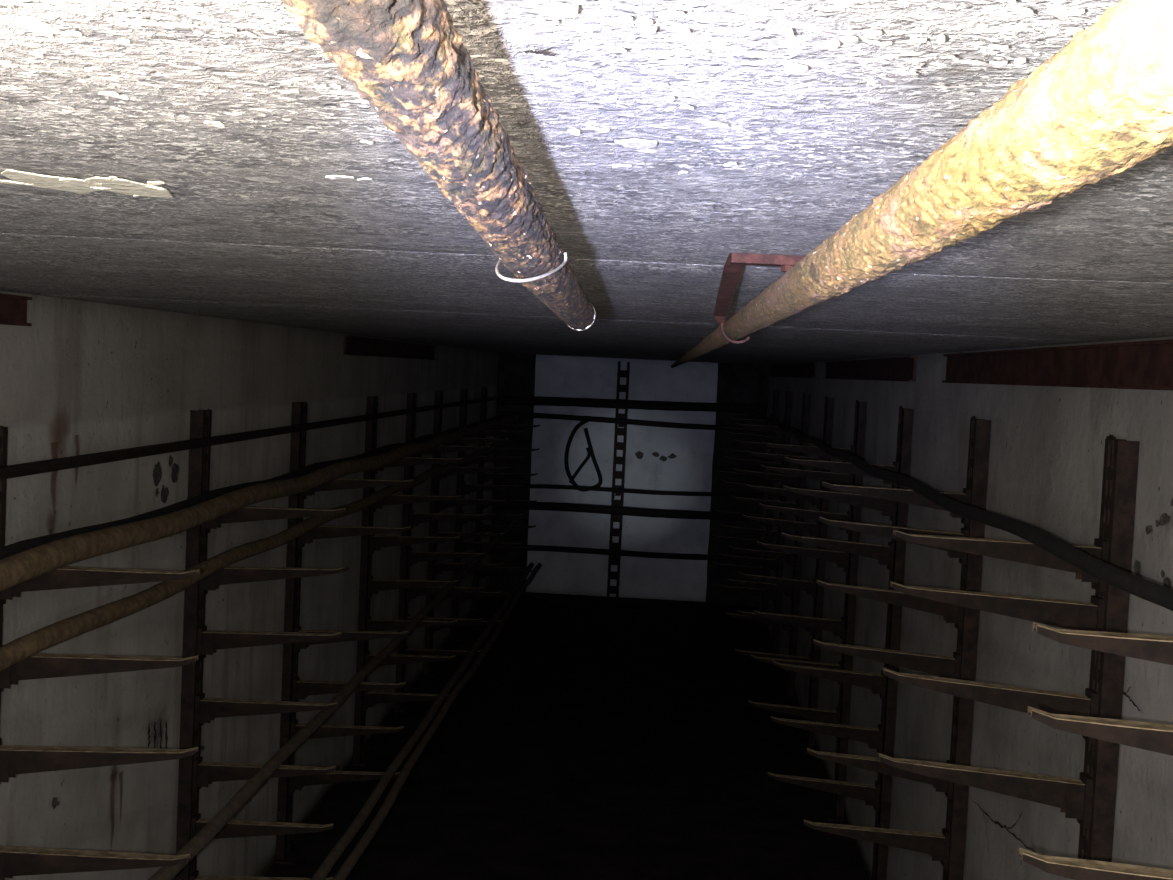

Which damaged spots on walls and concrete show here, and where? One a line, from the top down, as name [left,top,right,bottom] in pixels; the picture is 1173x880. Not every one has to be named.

peeling [0,169,173,198]